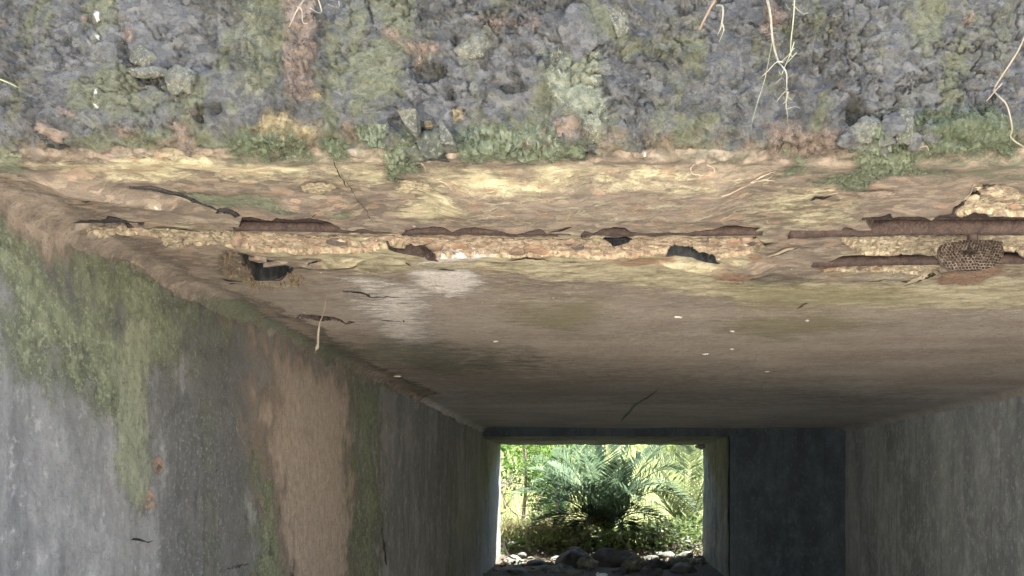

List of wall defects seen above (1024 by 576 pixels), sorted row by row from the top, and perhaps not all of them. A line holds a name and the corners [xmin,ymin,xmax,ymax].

crack [289,260,407,323]
damp [336,247,493,350]
spalling [79,208,764,281]
rust [225,220,763,250]
rust [788,219,1024,239]
rust [811,253,1024,285]
spalling [824,184,1024,278]
damp [0,181,441,576]